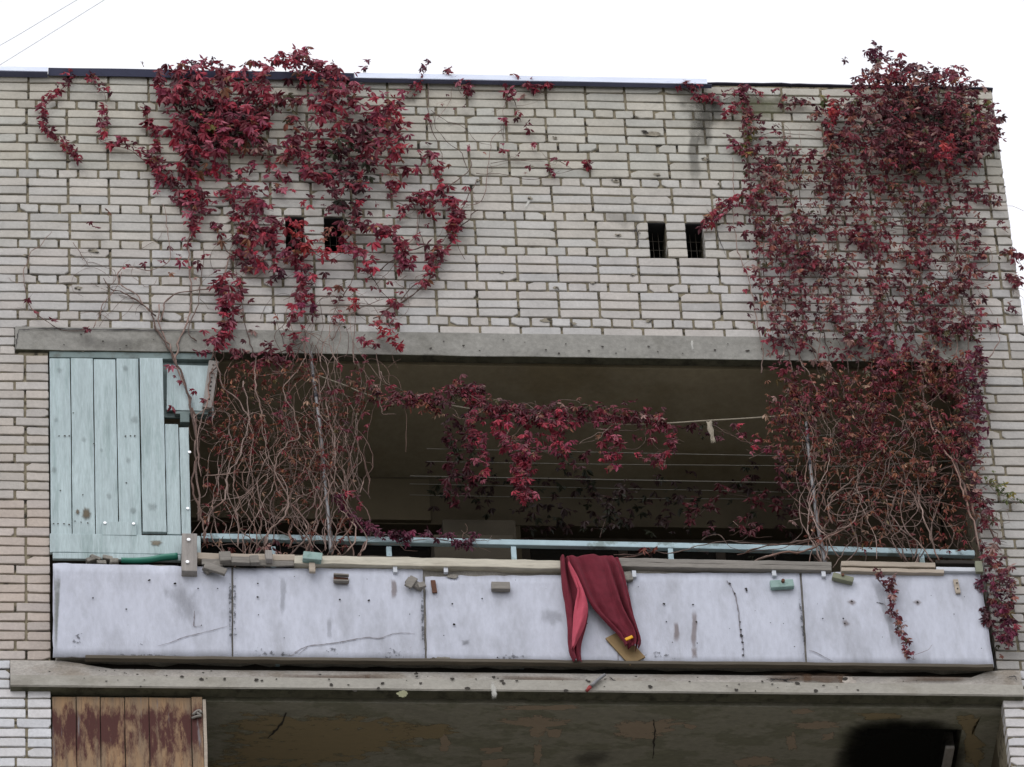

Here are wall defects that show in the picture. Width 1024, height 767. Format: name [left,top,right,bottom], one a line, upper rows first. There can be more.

crack [727,581,748,656]
crack [285,633,413,656]
crack [268,713,287,738]